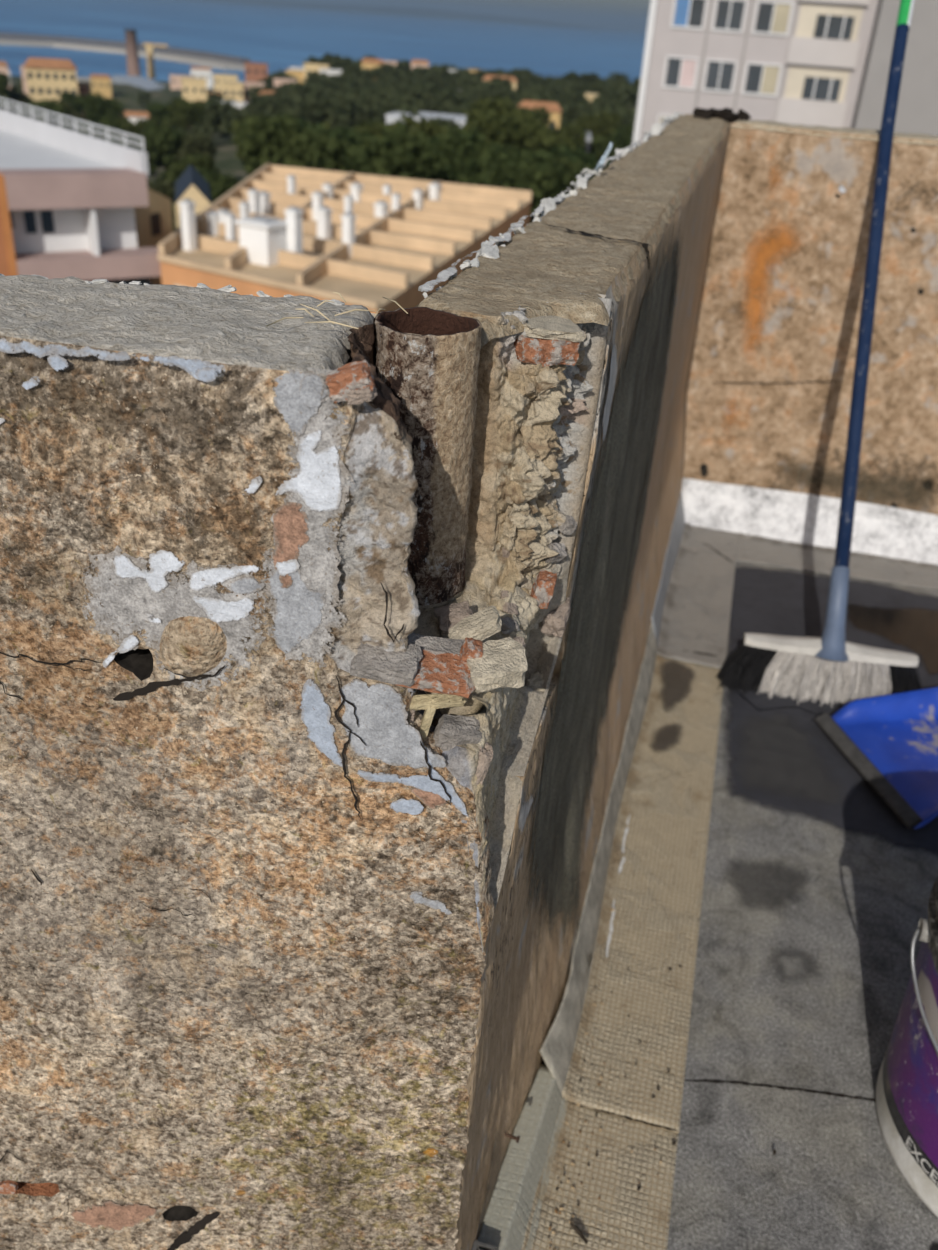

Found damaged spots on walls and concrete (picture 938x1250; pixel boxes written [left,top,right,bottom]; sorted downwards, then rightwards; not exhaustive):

peeling [418,112,685,298]
crack [544,224,651,247]
peeling [197,283,237,293]
spalling [82,293,612,952]
crack [380,582,404,642]
crack [0,652,101,702]
crack [164,665,226,680]
crack [334,675,366,819]
crack [420,741,451,804]